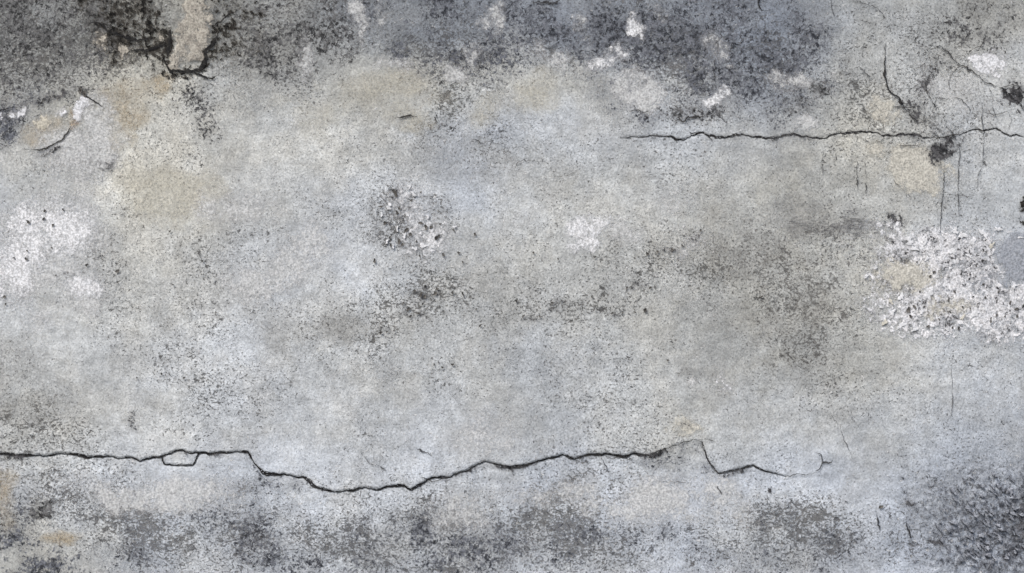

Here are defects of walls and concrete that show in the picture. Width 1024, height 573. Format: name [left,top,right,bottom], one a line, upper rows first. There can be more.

damp [0,0,136,150]
damp [172,69,228,144]
damp [210,0,861,131]
crack [620,40,1024,233]
peeling [860,218,1024,351]
crack [0,416,859,494]